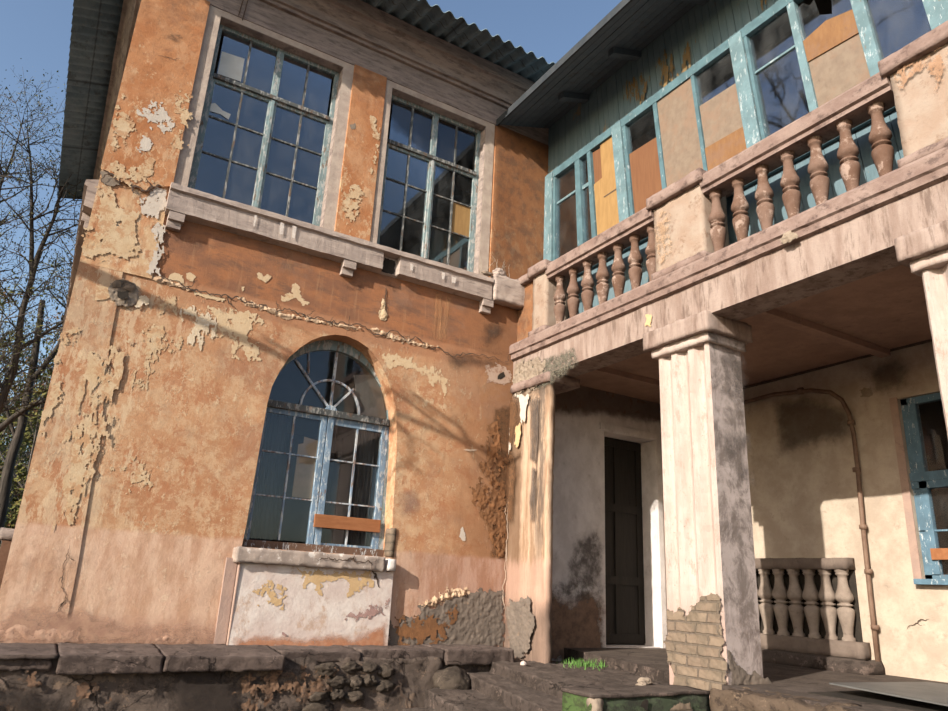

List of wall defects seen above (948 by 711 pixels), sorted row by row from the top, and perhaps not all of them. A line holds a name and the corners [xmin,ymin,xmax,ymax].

peeling [894,48,947,91]
peeling [57,90,450,525]
crack [155,276,509,363]
peeling [39,381,63,437]
flaking render [469,356,546,558]
crack [56,546,72,613]
peeling [252,580,287,610]
peeling [297,568,374,598]
flaking render [345,587,535,666]
damp [551,593,605,661]
flaking render [663,593,772,691]